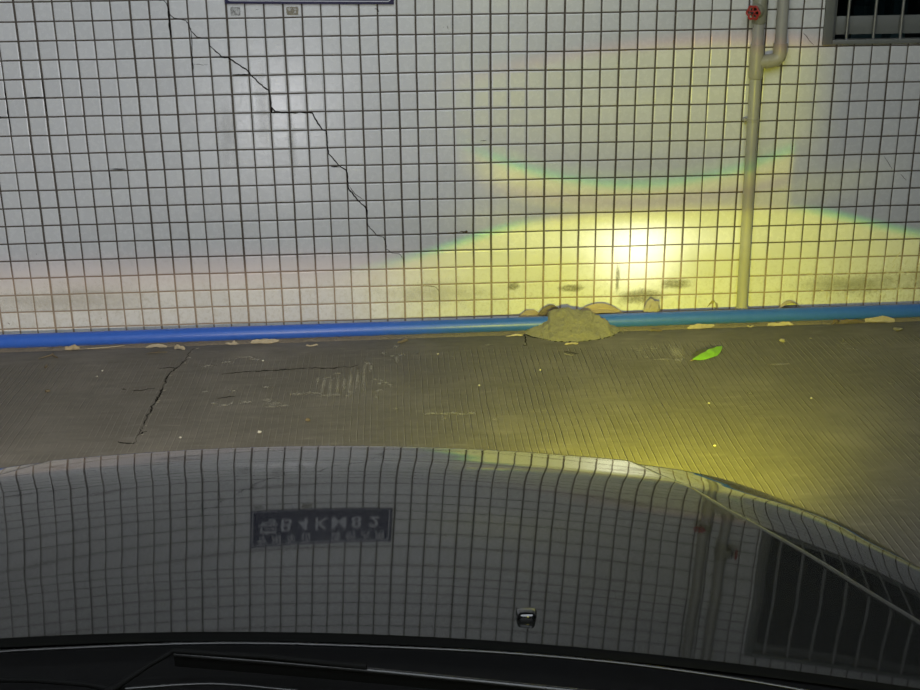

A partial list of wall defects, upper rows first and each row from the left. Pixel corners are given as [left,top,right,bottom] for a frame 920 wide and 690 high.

crack [158,0,404,259]
crack [118,348,198,445]